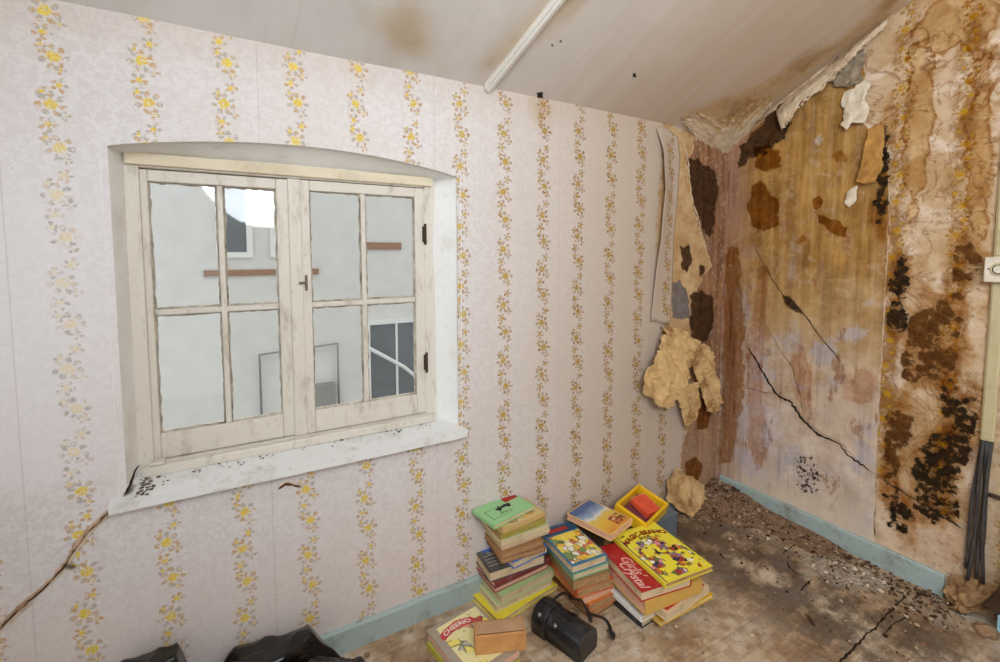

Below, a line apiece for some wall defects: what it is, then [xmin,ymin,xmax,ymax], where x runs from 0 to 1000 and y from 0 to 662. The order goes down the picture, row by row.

crack [751,236,839,359]
peeling [643,45,965,578]
crack [746,326,967,531]
leakage [882,242,982,534]
crack [0,464,141,635]
crack [839,585,918,662]